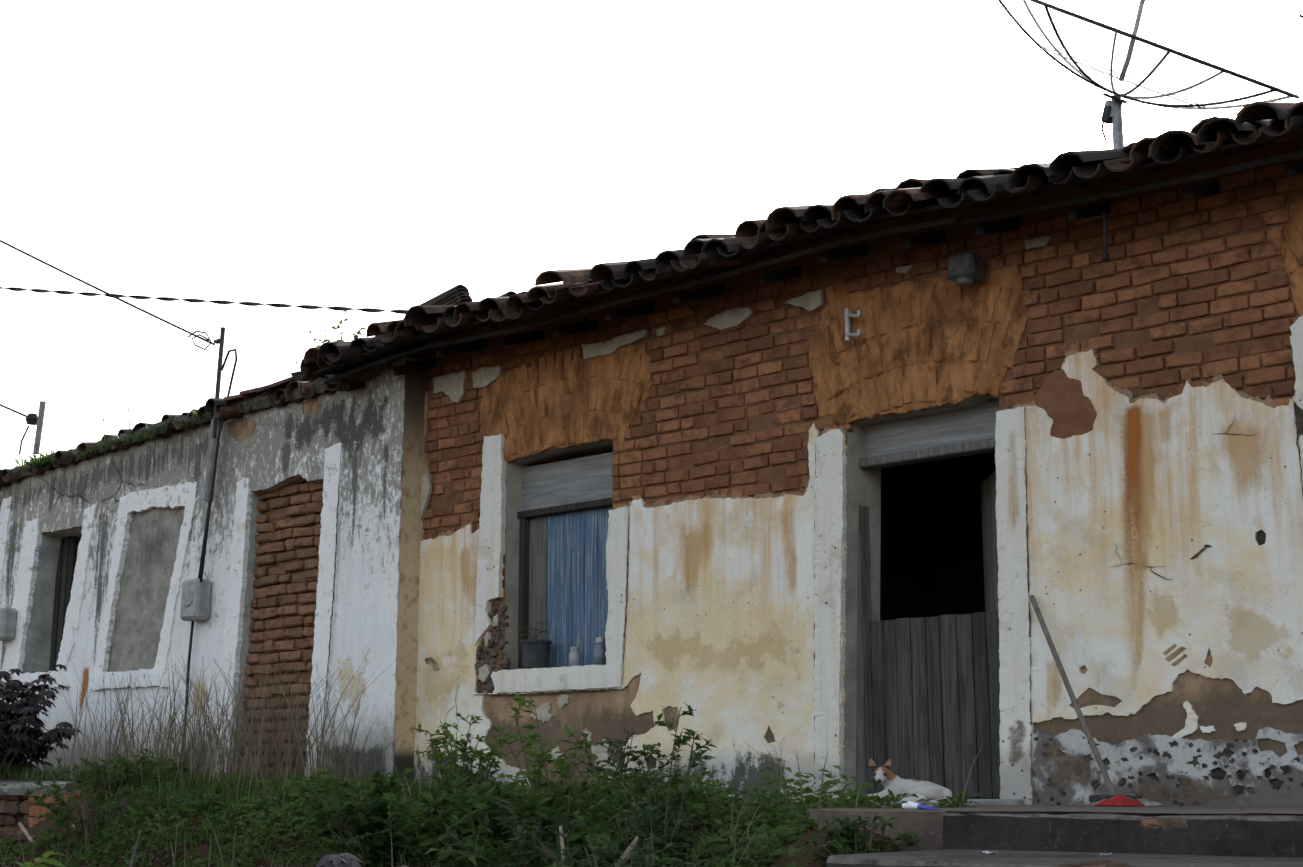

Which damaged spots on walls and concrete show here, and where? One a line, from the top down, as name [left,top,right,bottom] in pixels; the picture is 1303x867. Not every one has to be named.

flaking render [420,157,1303,541]
leakage [92,512,113,665]
leakage [1,433,208,608]
leakage [275,391,388,535]
flaking render [475,555,679,793]
rust [1122,407,1168,575]
flaking render [1034,644,1303,831]